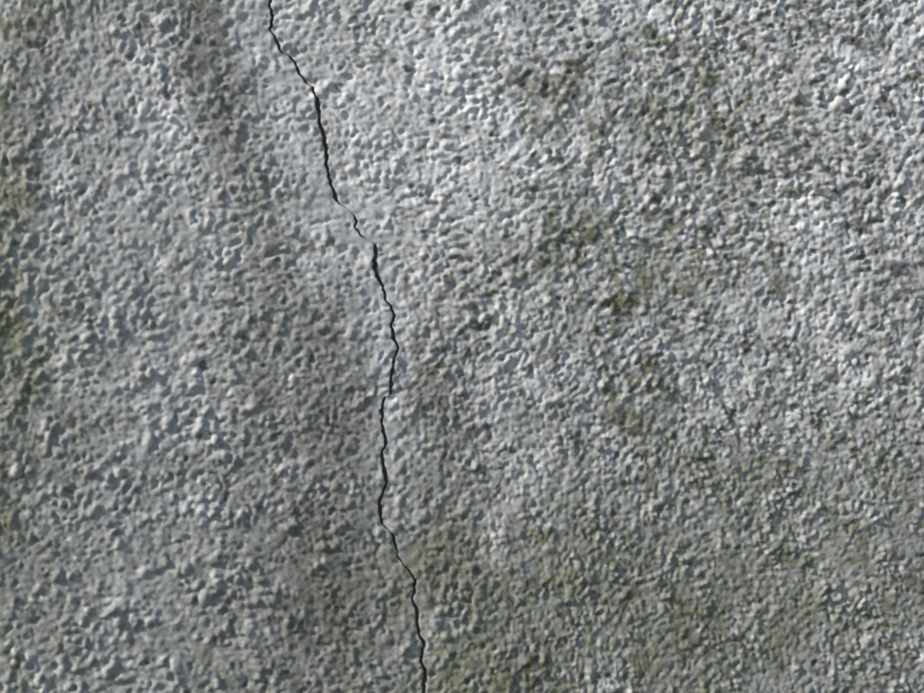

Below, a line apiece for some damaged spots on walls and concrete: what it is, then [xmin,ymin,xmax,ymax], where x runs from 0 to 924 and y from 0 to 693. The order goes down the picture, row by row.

crack [268,0,428,693]